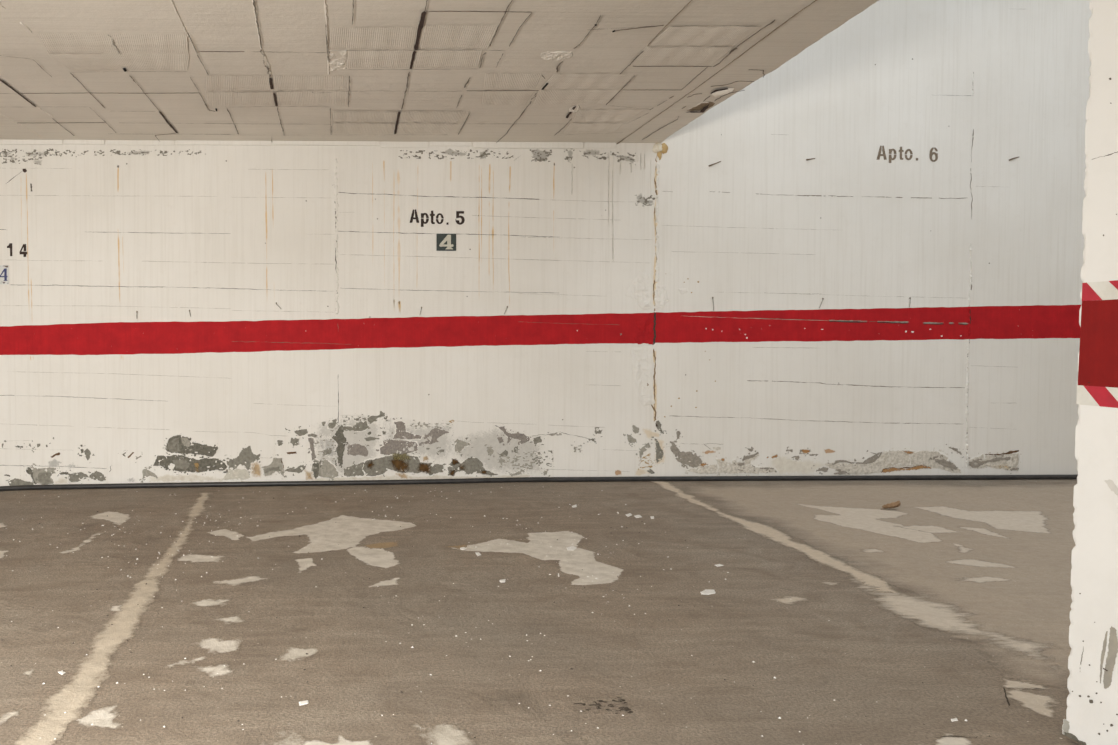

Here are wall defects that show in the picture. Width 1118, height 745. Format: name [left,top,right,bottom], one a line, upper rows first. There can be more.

crack [394,0,817,421]
peeling [2,437,107,486]
spalling [122,407,603,483]
spalling [615,416,1023,476]